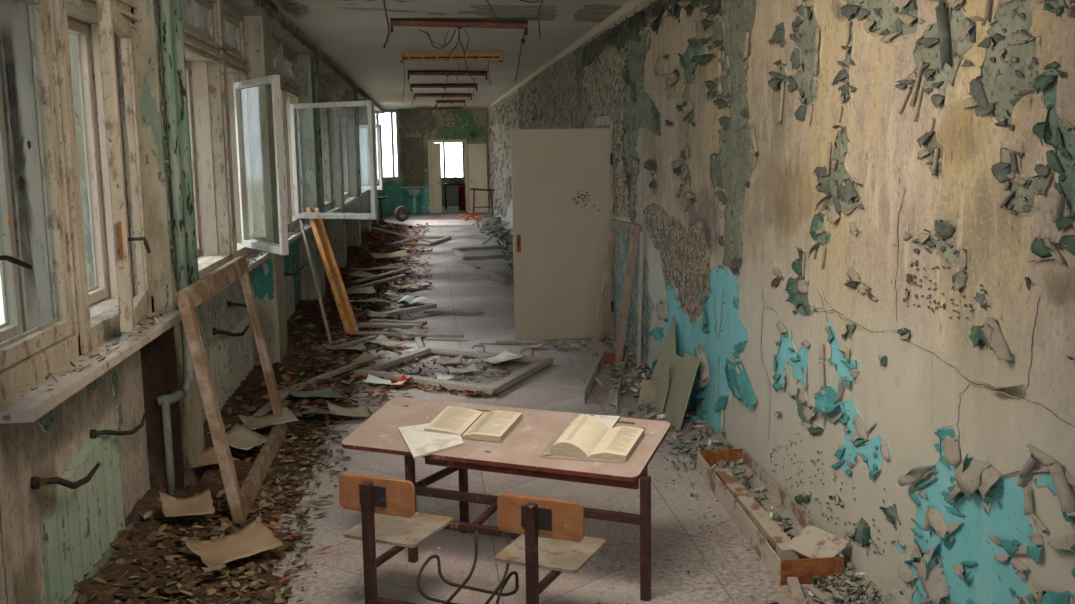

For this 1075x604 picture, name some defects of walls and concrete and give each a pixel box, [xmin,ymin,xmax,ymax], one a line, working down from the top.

peeling [398,110,439,137]
peeling [456,0,759,438]
peeling [768,0,1075,604]
crack [815,186,1075,464]